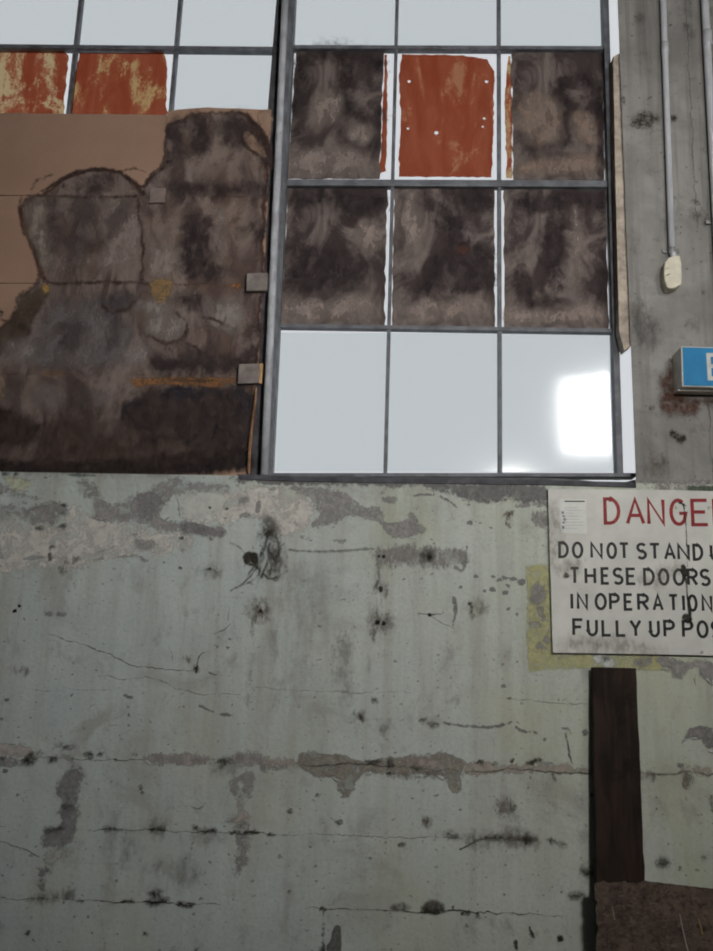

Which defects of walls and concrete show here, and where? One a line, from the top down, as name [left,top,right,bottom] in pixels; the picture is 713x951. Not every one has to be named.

flaking render [0,473,548,573]
crack [62,614,231,717]
peeling [656,656,713,685]
peeling [682,725,713,753]
spalling [0,743,37,768]